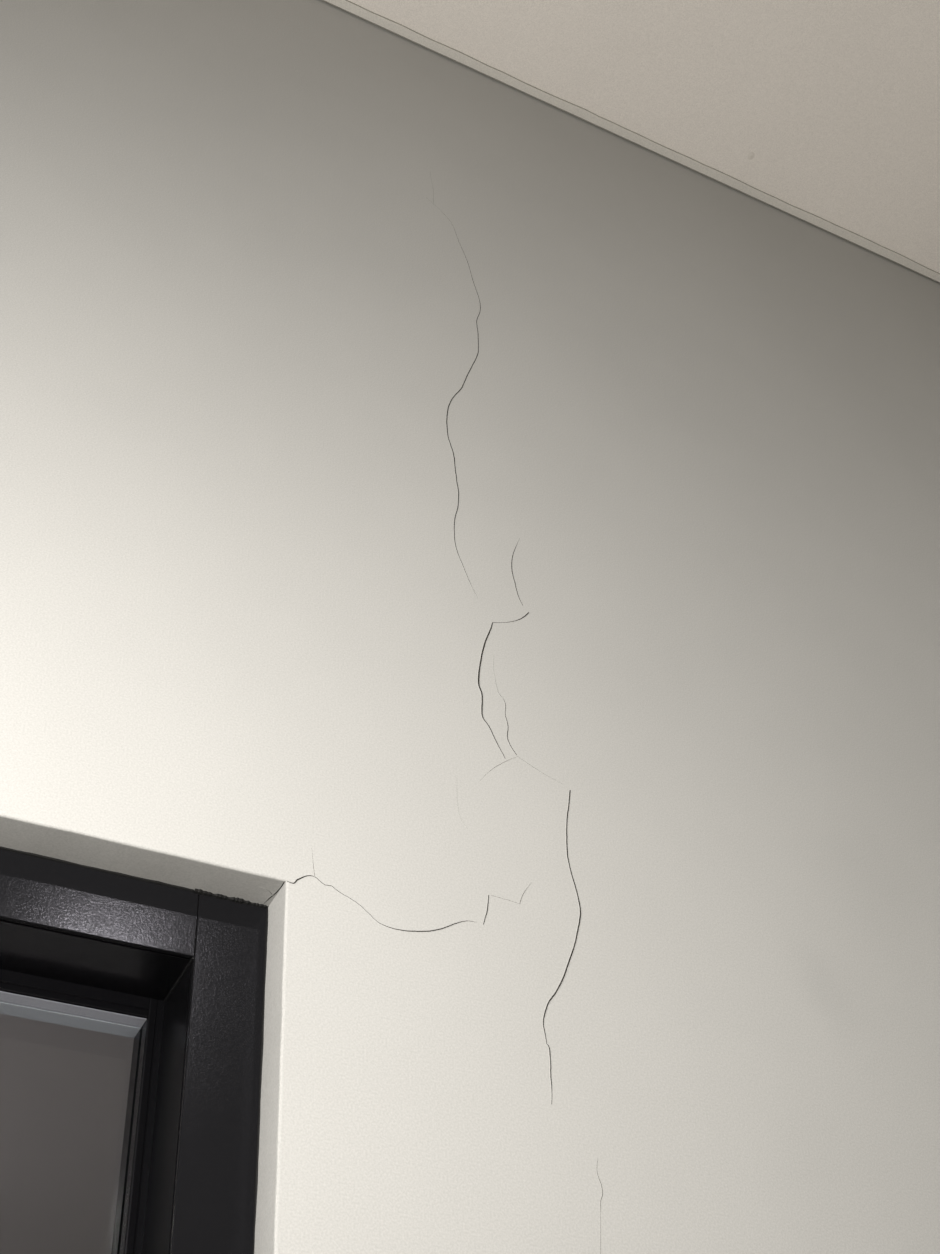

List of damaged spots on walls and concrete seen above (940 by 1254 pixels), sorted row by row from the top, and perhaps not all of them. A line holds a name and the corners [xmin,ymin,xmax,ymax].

crack [261,848,532,933]
crack [429,172,582,1104]